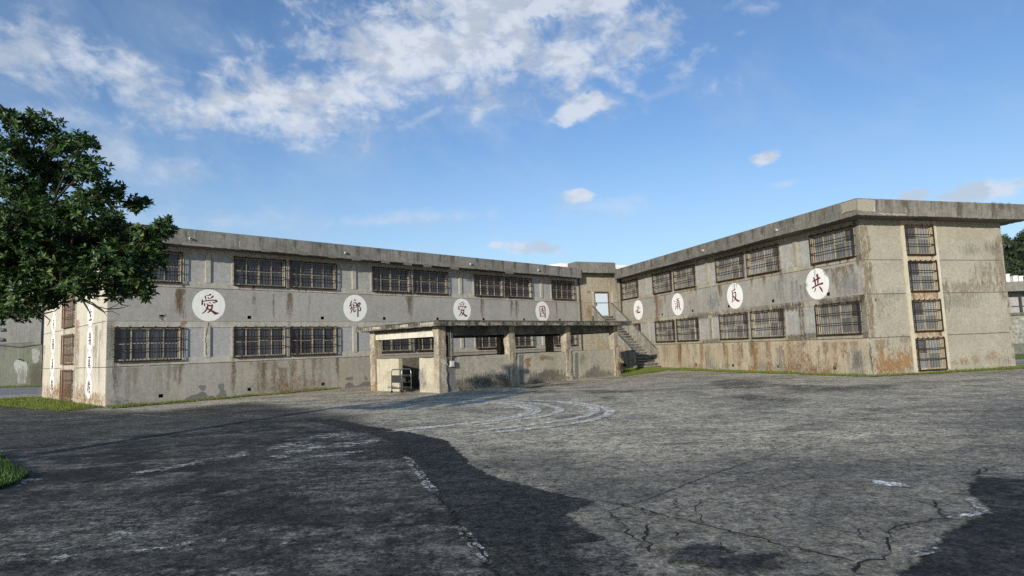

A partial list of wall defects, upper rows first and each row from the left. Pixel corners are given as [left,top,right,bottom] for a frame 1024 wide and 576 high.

rust [175,285,187,349]
rust [723,341,772,371]
rust [869,334,922,375]
crack [598,433,951,573]